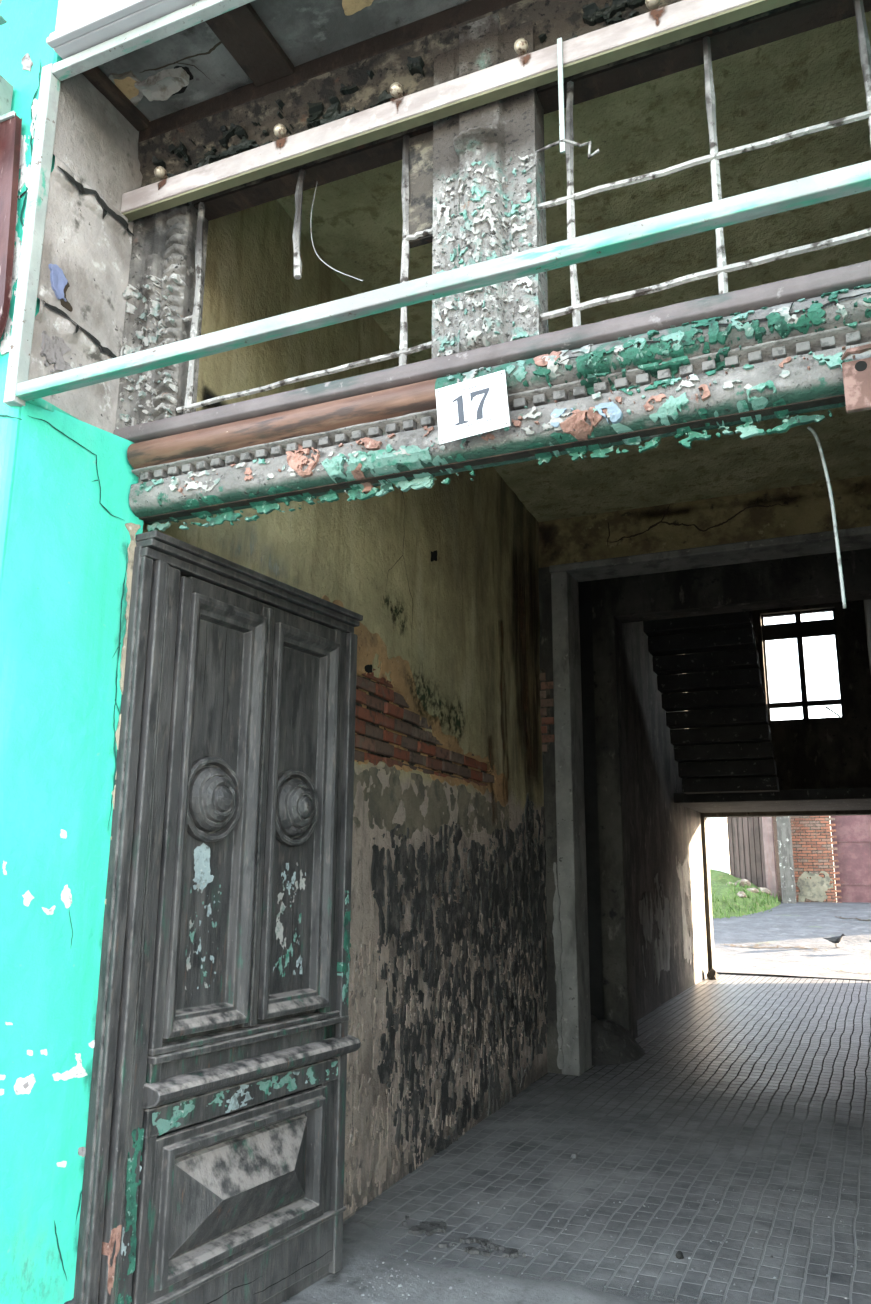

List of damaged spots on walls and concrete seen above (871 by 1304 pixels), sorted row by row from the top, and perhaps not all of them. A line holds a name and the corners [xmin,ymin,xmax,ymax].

peeling [109,66,193,106]
peeling [407,56,425,77]
peeling [152,69,405,178]
peeling [432,155,534,273]
crack [43,300,117,358]
peeling [116,273,871,695]
crack [0,414,128,826]
peeling [101,623,564,1304]
peeling [0,1074,36,1096]
peeling [52,1040,95,1081]
peeling [56,1147,86,1168]